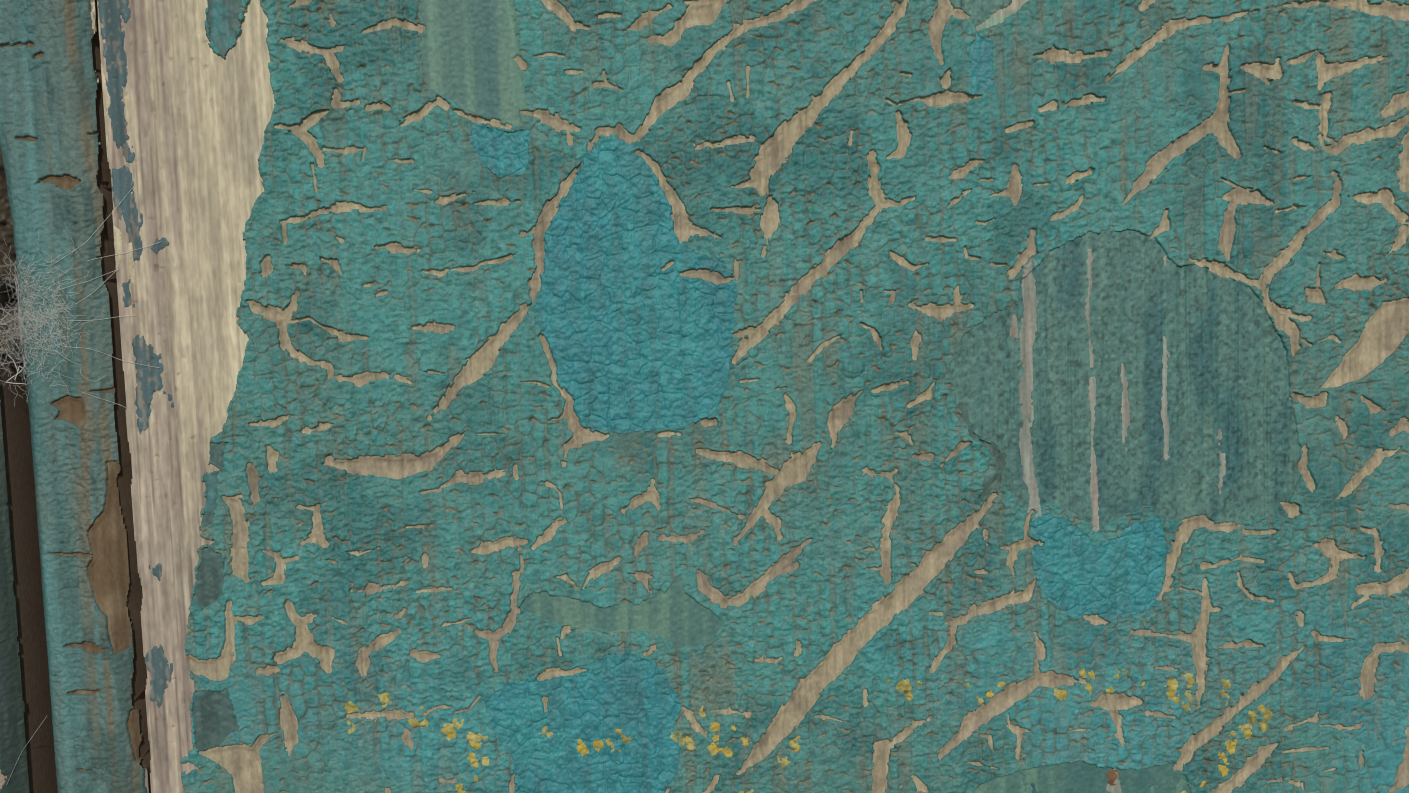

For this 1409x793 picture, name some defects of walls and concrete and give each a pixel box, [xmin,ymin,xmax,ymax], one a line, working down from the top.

peeling [52,396,86,427]
peeling [88,0,280,793]
peeling [266,445,279,474]
peeling [355,646,370,677]
crack [185,0,1093,793]
crack [1033,0,1409,356]
crack [1083,391,1409,793]
peeling [1320,298,1409,389]